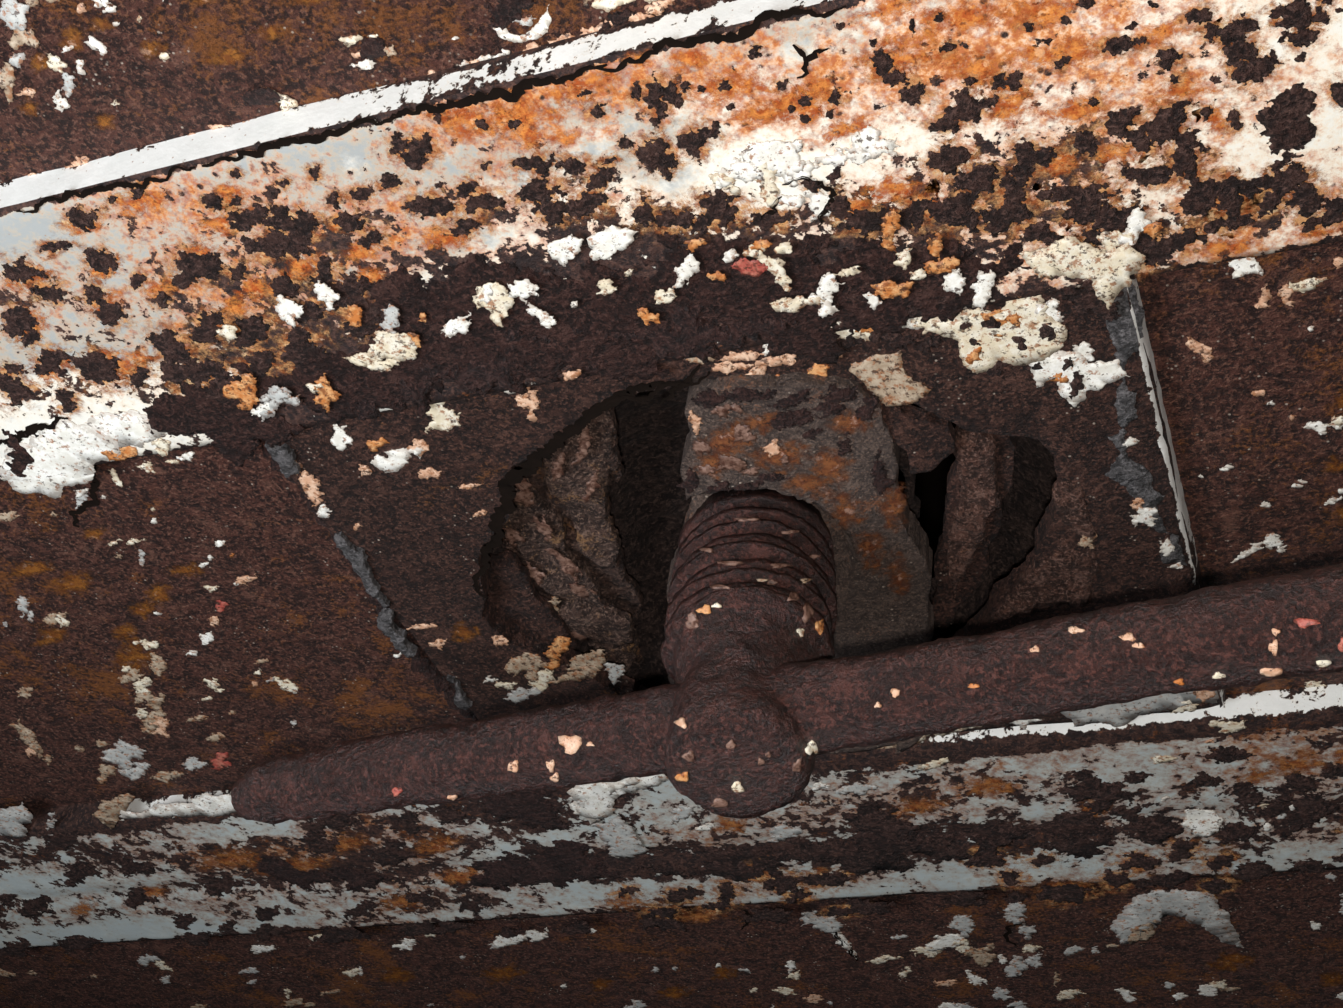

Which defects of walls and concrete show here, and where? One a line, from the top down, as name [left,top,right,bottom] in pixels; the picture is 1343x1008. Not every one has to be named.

peeling [0,0,107,112]
rust [0,42,871,419]
spalling [459,0,674,66]
spalling [0,125,1172,518]
rust [838,316,1056,372]
rust [799,0,1343,276]
rust [1062,357,1085,400]
crack [472,364,710,599]
peeling [74,639,236,829]
spalling [256,719,1343,956]
spalling [738,883,1087,1008]
rust [959,837,1241,908]